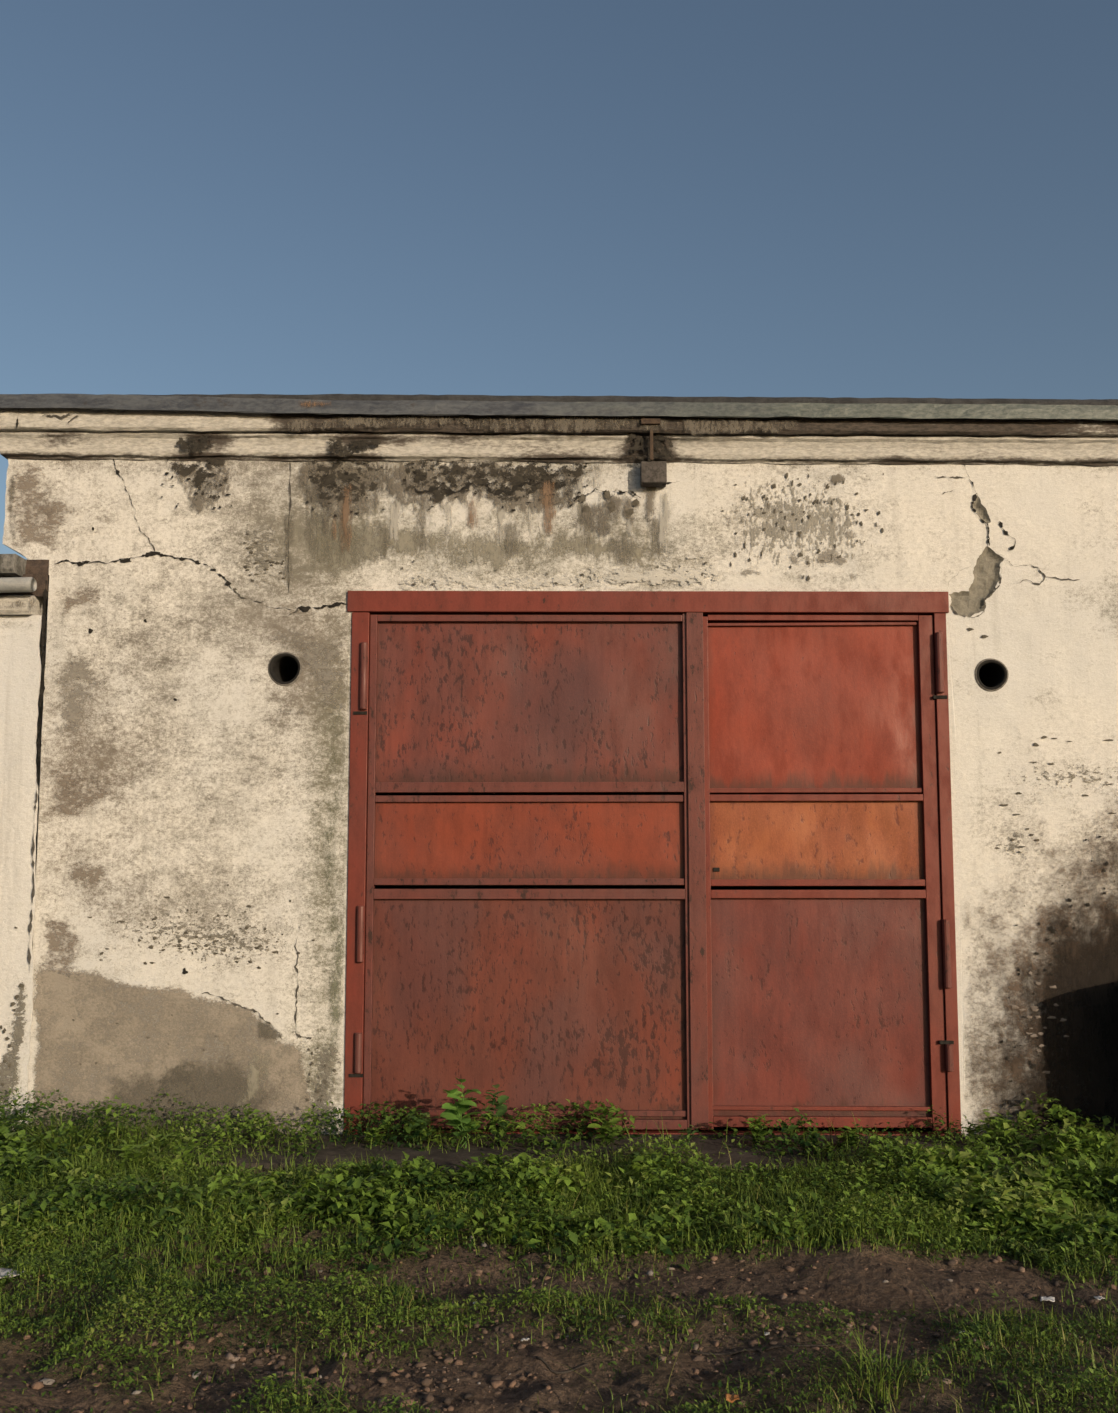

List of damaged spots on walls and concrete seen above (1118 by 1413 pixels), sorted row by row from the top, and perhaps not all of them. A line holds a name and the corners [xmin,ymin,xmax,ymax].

water stain [161,434,237,512]
water stain [274,415,796,583]
spalling [949,546,1004,638]
spalling [971,493,991,524]
crack [956,522,1079,585]
crack [28,459,346,972]
peeling [995,736,1118,860]
water stain [31,921,321,1139]